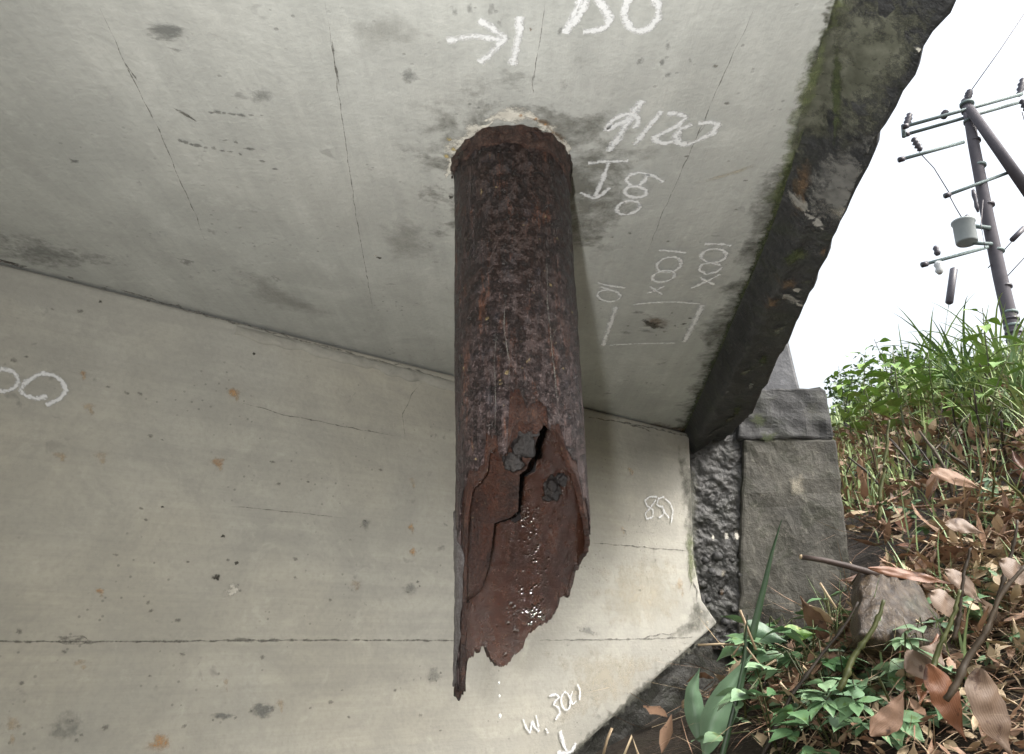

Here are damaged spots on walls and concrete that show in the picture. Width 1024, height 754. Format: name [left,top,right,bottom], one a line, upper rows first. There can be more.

leakage [435,107,600,178]
leakage [570,155,619,242]
leakage [651,165,792,433]
peeling [467,401,544,600]